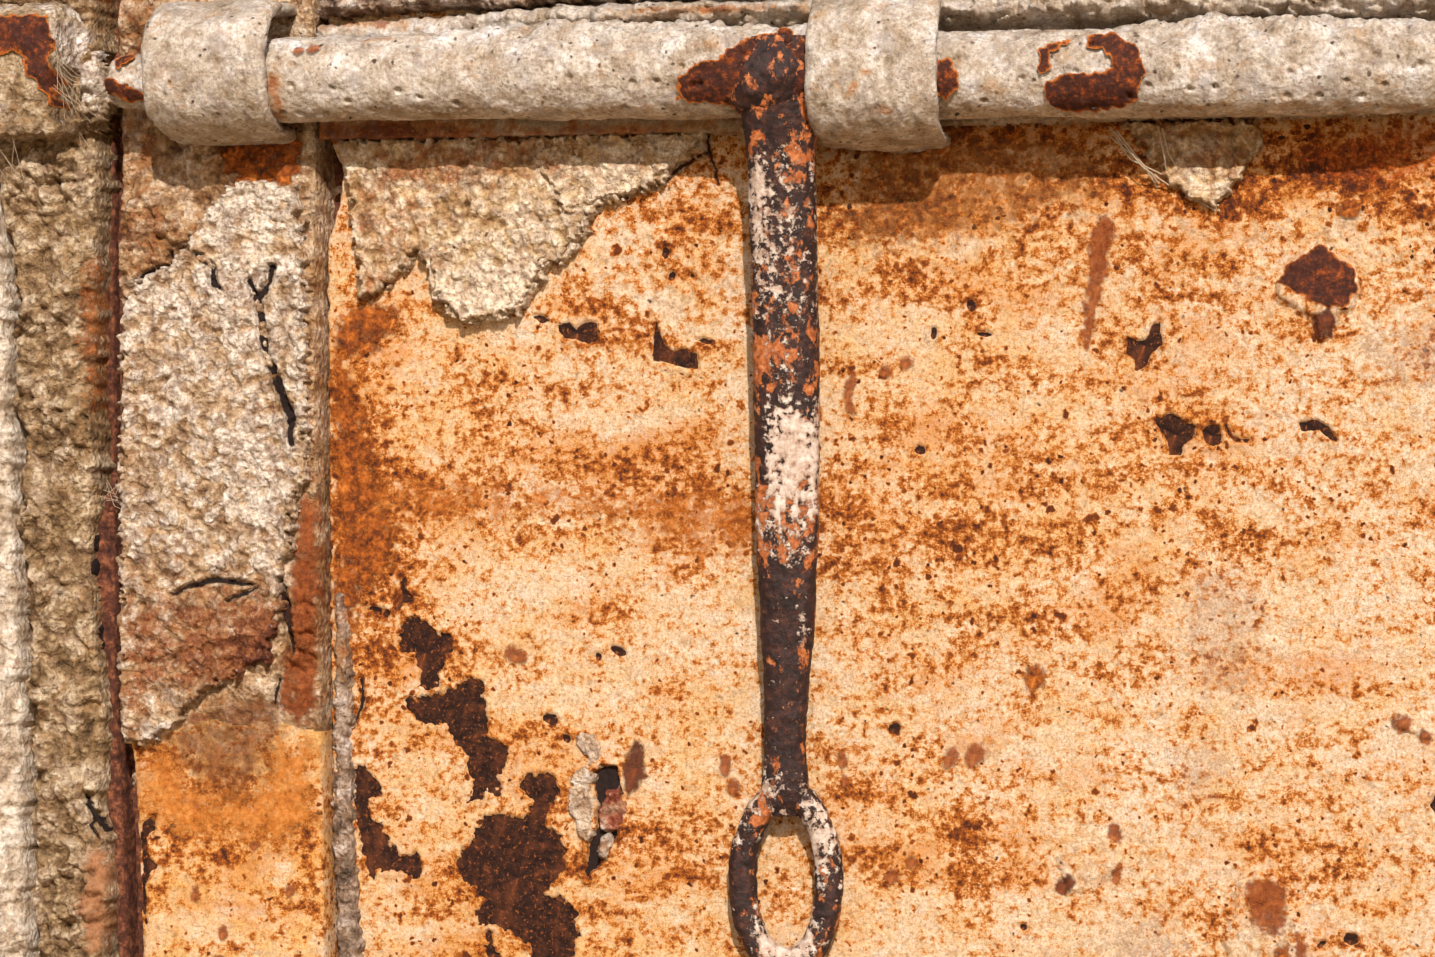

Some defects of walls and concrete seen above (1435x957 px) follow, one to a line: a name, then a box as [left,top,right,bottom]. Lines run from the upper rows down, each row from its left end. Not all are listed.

corrosion [0,13,70,109]
corrosion [1037,31,1146,113]
peeling [337,132,710,344]
corrosion [1080,216,1116,351]
corrosion [1272,236,1363,343]
crack [124,252,296,446]
corrosion [280,301,510,725]
crack [173,577,295,704]
corrosion [623,741,648,797]
corrosion [1388,704,1435,745]
corrosion [1054,824,1130,898]
corrosion [1219,868,1315,957]